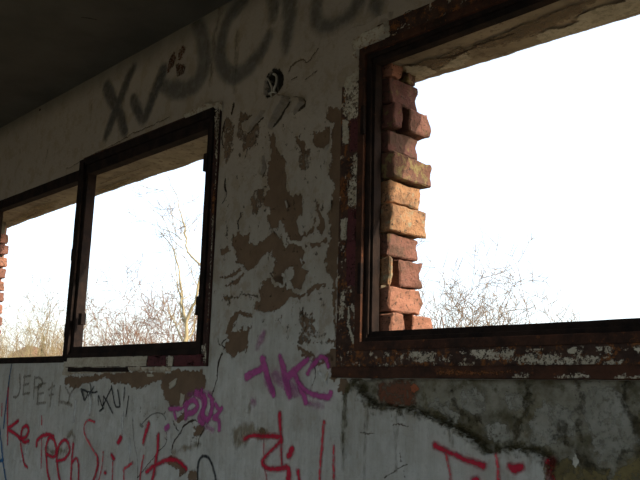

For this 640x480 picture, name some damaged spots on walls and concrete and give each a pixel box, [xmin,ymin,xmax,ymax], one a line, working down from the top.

water stain [414,0,596,70]
peeling [535,0,640,43]
flaking render [183,11,640,480]
flaking render [62,346,206,442]
water stain [342,378,559,466]